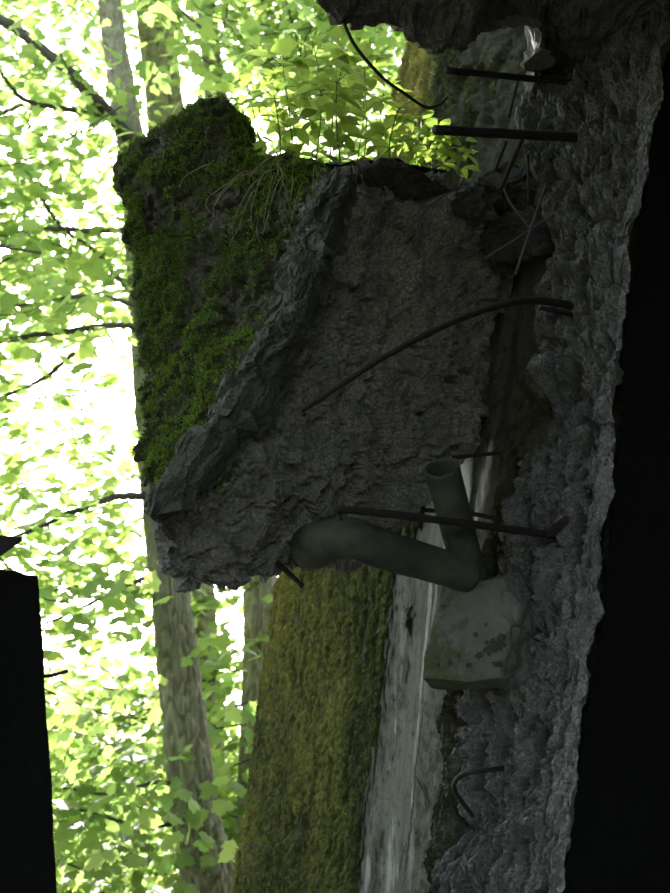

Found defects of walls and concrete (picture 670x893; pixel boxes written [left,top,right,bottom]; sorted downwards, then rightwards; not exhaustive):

spalling [142,166,358,524]
spalling [275,560,304,588]
spalling [300,8,670,893]